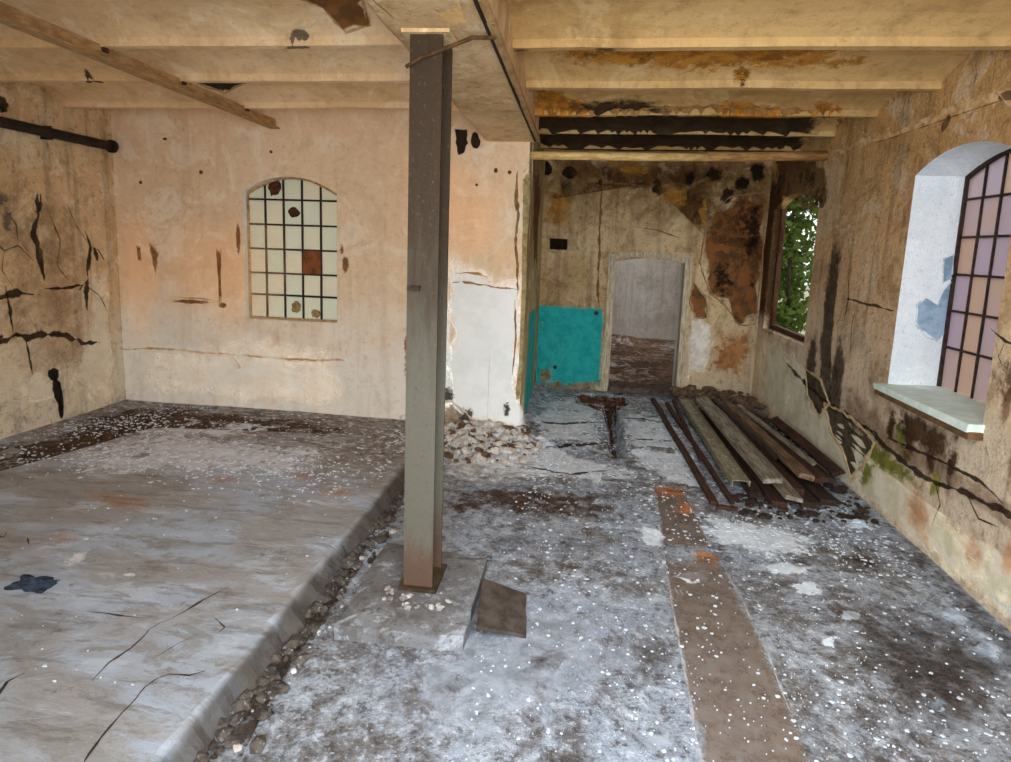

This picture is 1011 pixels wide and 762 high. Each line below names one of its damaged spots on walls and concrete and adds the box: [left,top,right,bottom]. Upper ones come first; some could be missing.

flaking render [301,0,371,34]
spalling [471,132,481,148]
crack [0,194,107,374]
flaking render [516,175,530,399]
leakage [528,164,728,264]
flaking render [689,192,766,326]
leakage [710,334,747,374]
crack [844,280,894,330]
crack [991,329,1011,370]
leakage [739,171,1011,649]
crack [785,354,1011,527]
leakage [865,622,997,729]